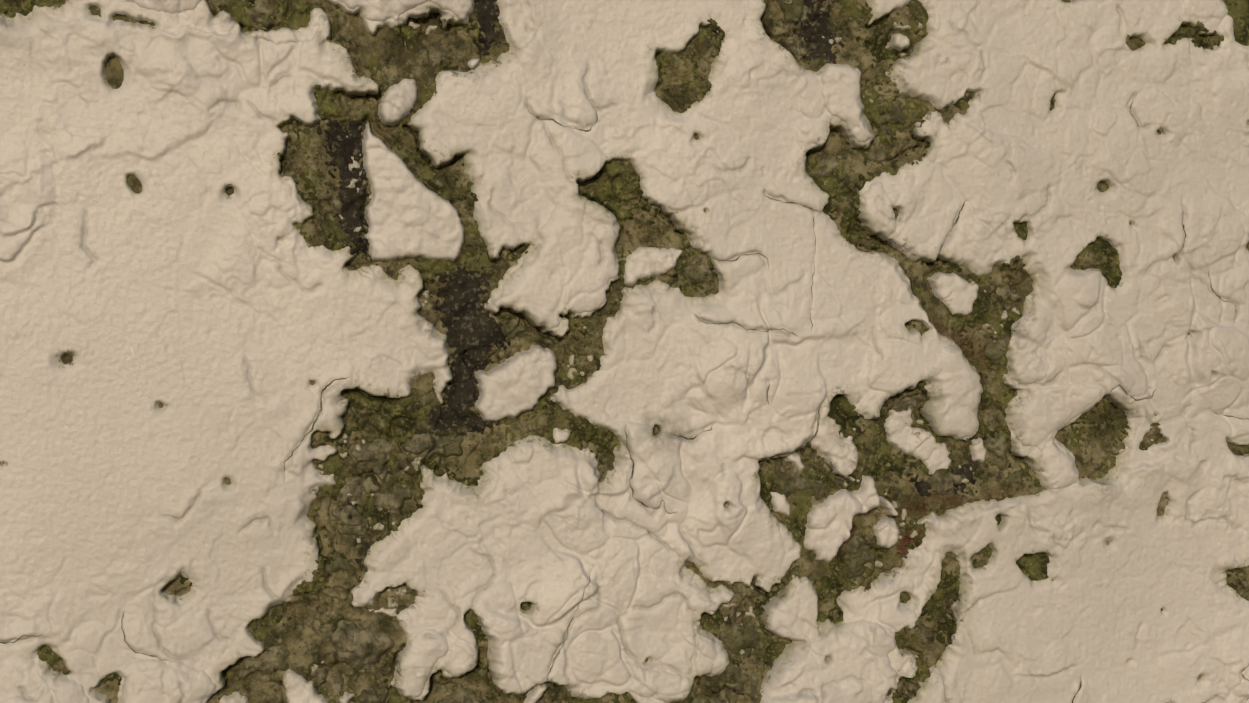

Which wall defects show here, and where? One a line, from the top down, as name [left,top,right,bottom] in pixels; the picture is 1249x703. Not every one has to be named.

spalling [89,6,155,26]
spalling [1164,0,1249,50]
spalling [105,56,124,89]
spalling [127,175,142,193]
crack [696,190,820,338]
spalling [206,0,725,703]
spalling [671,0,1043,703]
spalling [1055,396,1167,480]
spalling [162,575,192,596]
spalling [1016,552,1050,581]
spalling [1226,566,1249,601]
spalling [93,672,122,703]